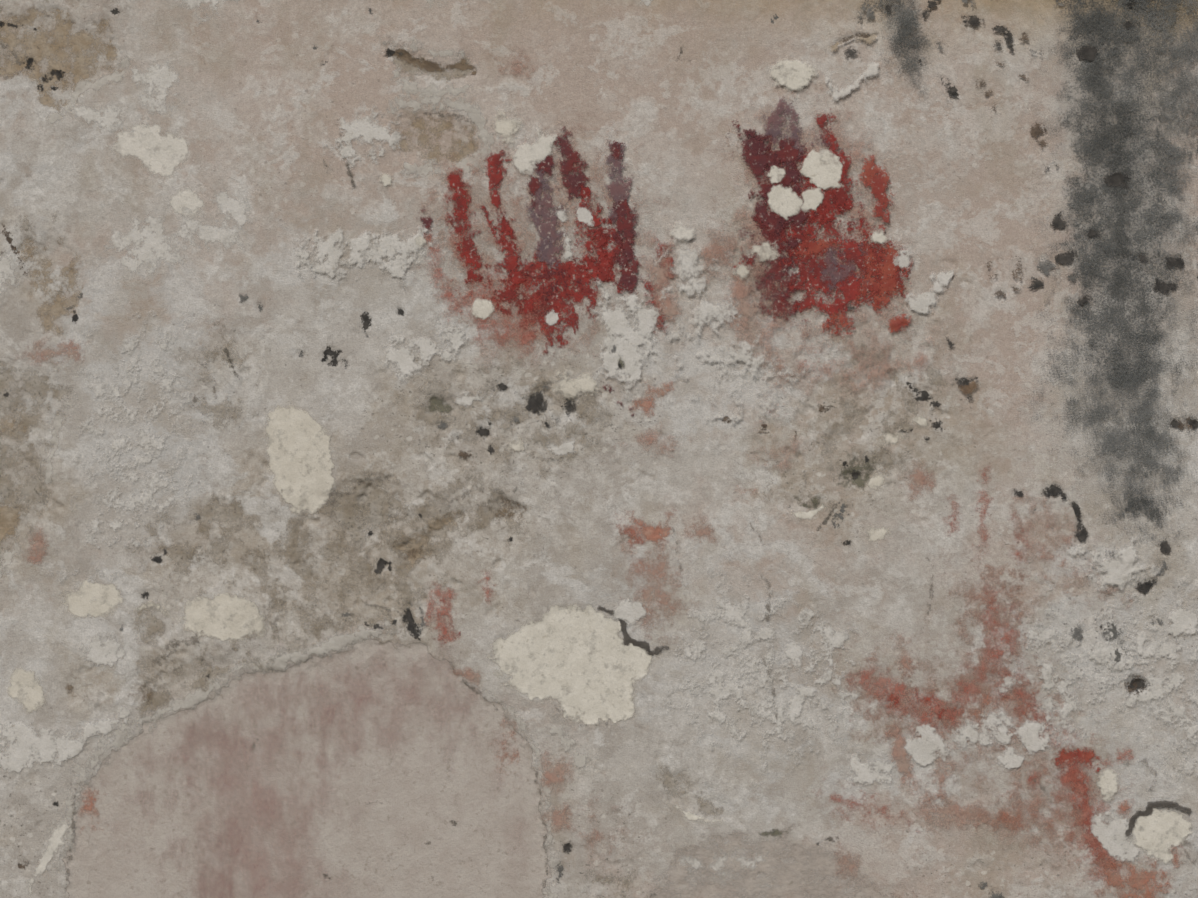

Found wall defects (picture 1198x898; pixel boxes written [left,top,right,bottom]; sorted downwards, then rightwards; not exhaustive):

spalling [0,8,130,123]
spalling [380,38,495,186]
water stain [831,0,942,88]
water stain [987,0,1198,525]
water stain [1027,484,1088,566]
water stain [1136,541,1171,594]
spalling [54,476,560,898]
peeling [488,599,669,725]